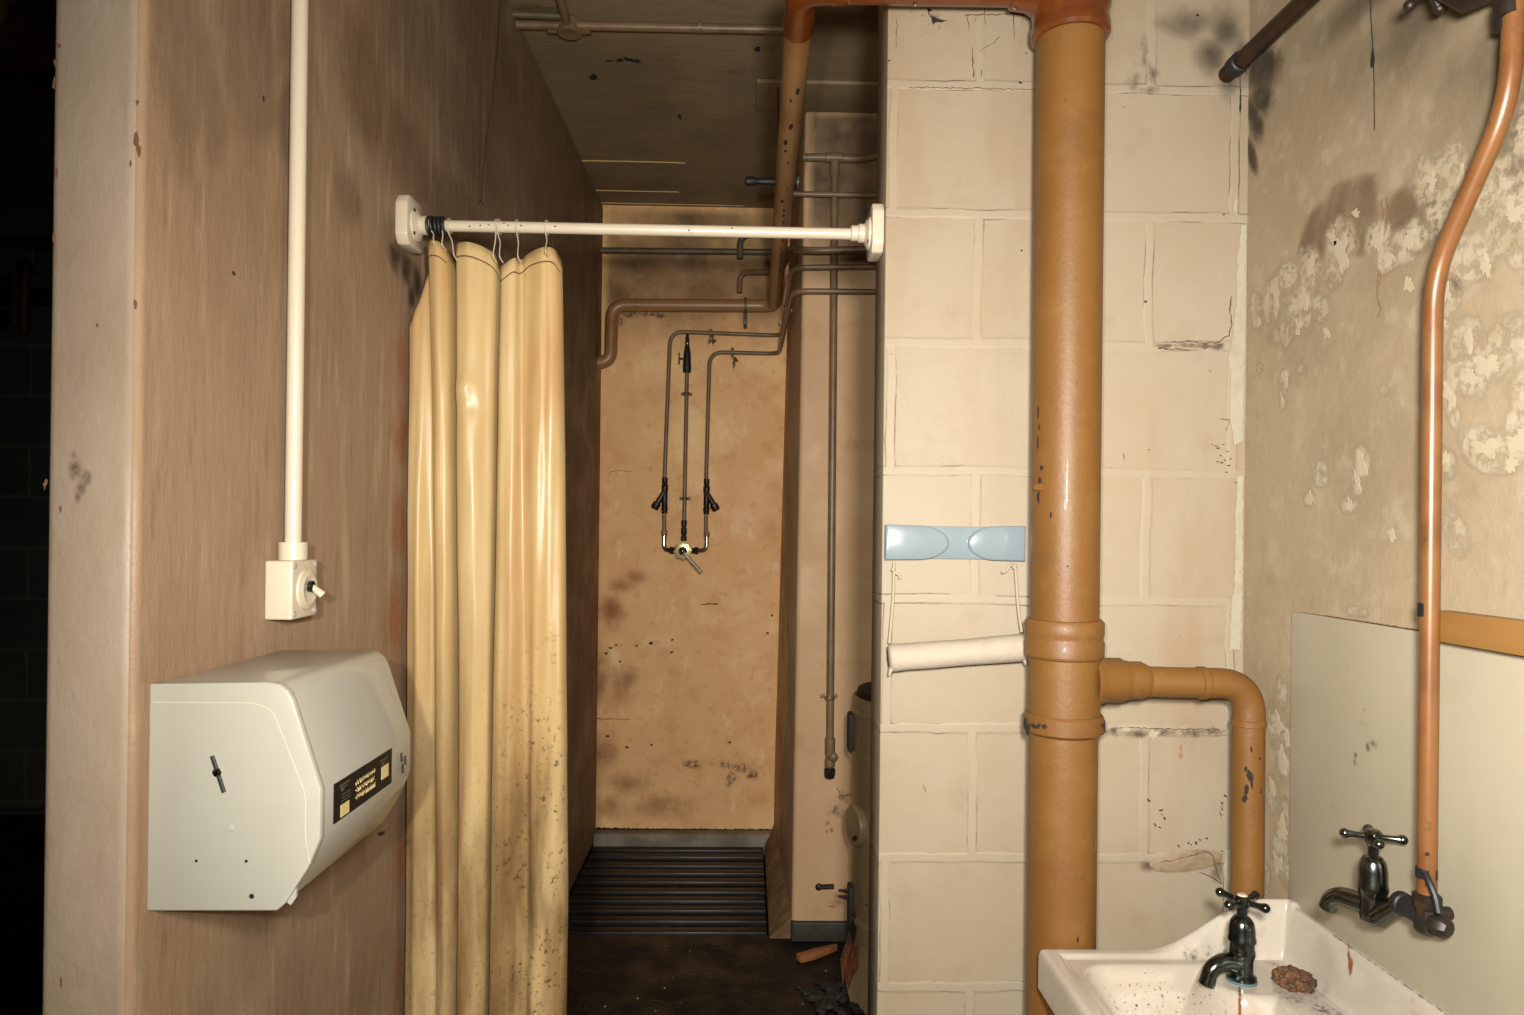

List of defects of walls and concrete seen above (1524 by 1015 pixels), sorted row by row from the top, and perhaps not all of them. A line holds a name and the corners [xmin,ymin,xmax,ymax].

crack [1158,296,1232,351]
peeling [1250,142,1470,350]
peeling [1442,103,1524,478]
peeling [1340,444,1370,513]